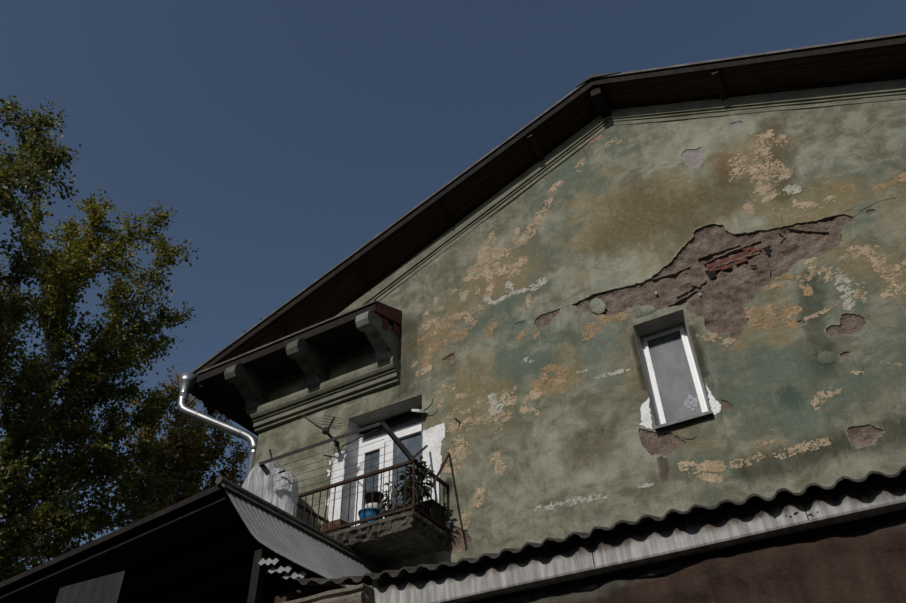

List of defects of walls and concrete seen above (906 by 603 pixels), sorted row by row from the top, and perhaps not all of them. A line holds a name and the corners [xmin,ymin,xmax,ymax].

peeling [728,129,857,215]
peeling [411,180,564,382]
flaking render [573,214,906,347]
peeling [434,356,630,476]
flaking render [639,427,686,456]
peeling [677,437,831,484]
flaking render [847,424,884,447]